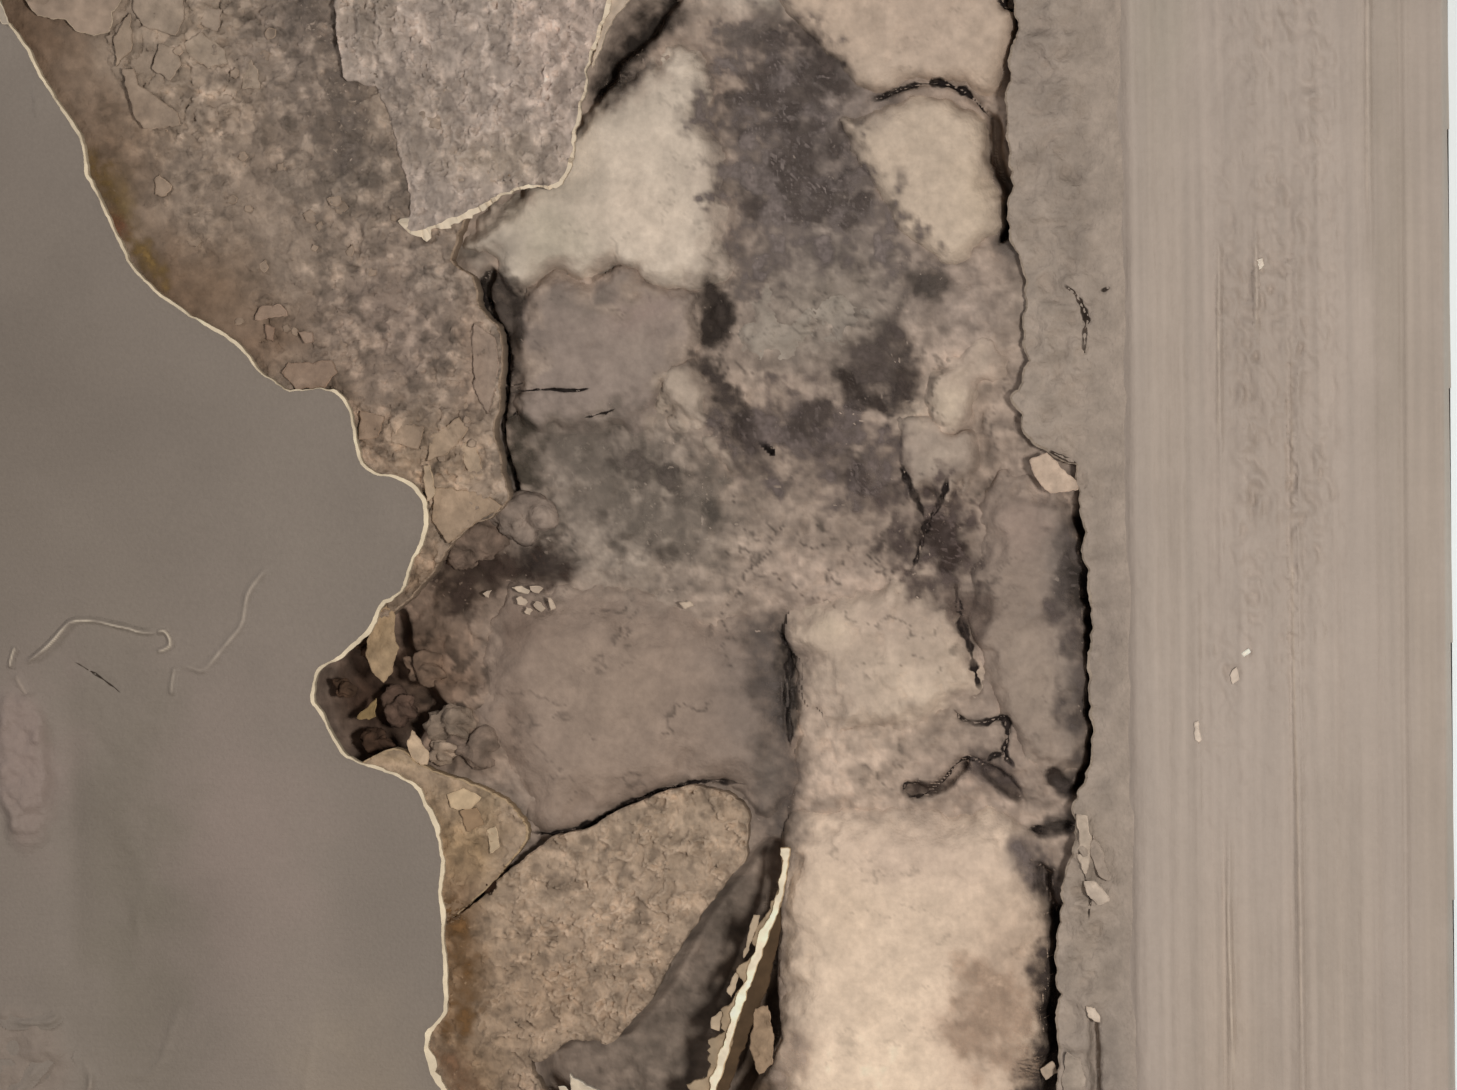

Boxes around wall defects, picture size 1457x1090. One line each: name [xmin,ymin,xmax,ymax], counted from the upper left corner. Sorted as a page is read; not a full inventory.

damp [993,241,1019,260]
damp [490,0,993,641]
crack [1050,451,1076,463]
spalling [0,0,752,1090]
damp [433,545,573,615]
crack [901,467,949,565]
spalling [1004,0,1110,1090]
damp [750,617,797,743]
crack [903,586,1019,798]
damp [910,756,1020,798]
flaking render [750,1005,774,1074]